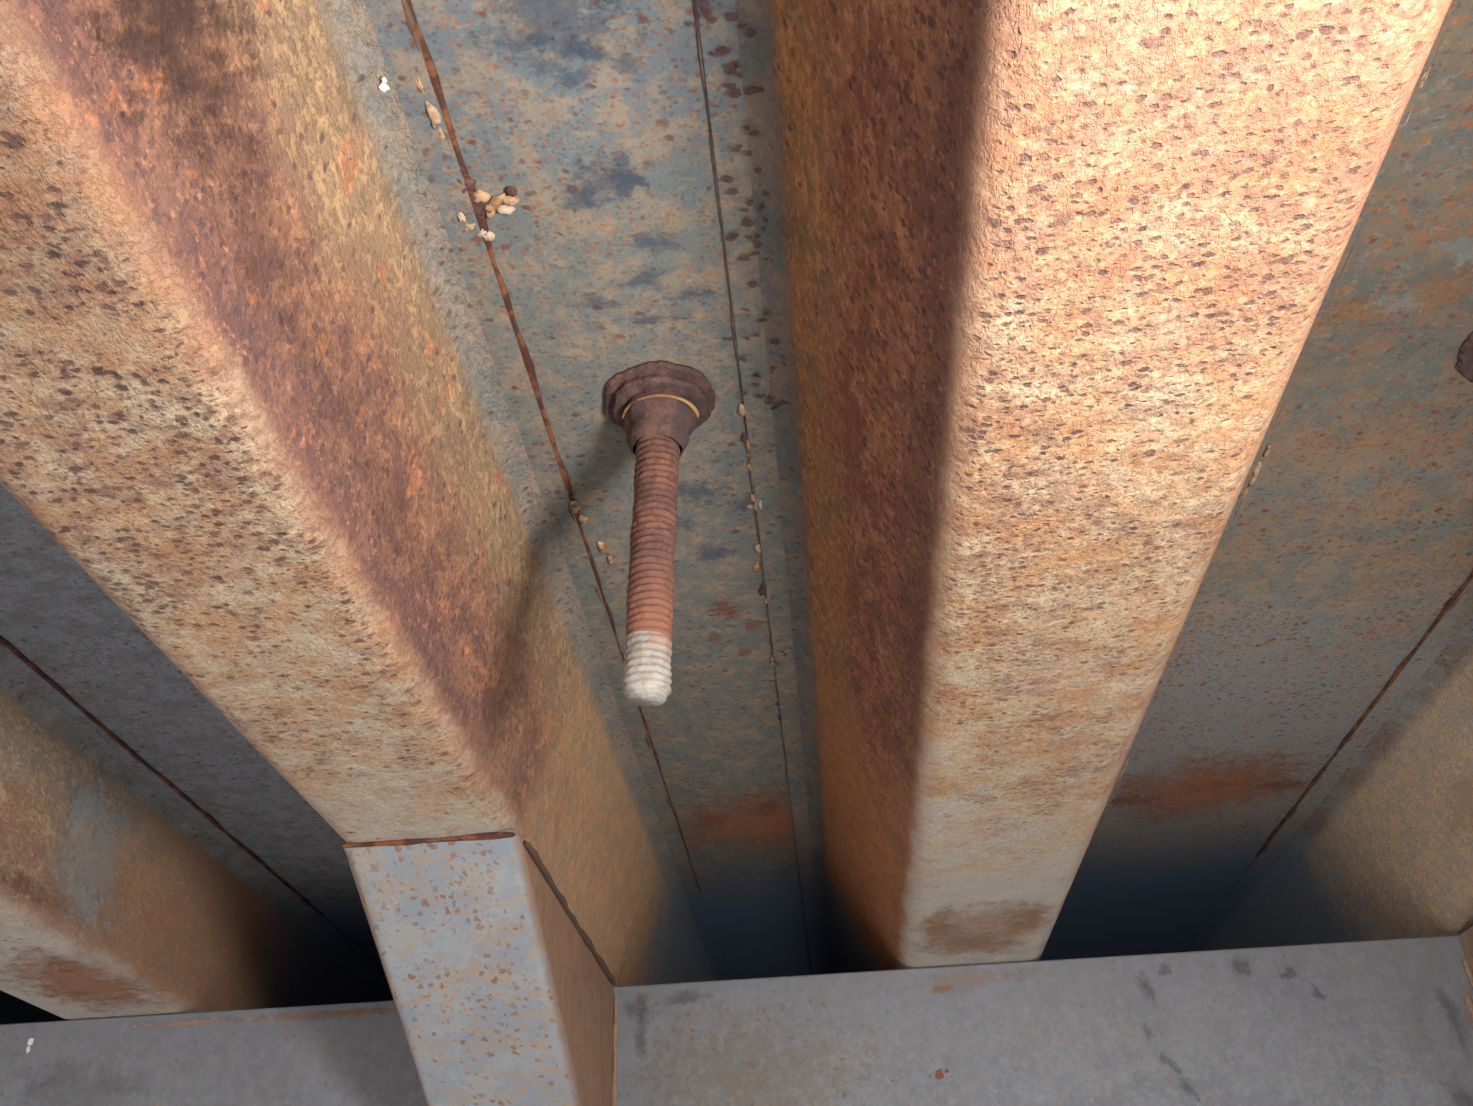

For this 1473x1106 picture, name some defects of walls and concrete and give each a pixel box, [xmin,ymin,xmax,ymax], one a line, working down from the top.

rust [691,0,758,38]
rust [711,46,765,98]
rust [714,175,767,262]
rust [727,311,781,410]